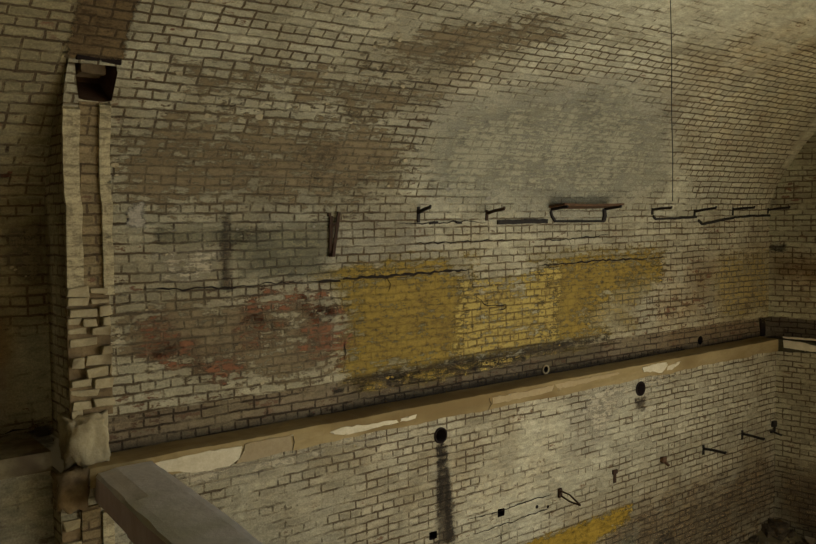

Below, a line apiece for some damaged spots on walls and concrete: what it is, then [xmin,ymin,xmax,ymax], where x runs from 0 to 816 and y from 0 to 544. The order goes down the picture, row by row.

crack [401,214,516,245]
crack [156,269,506,313]
peeling [782,336,816,352]
peeling [330,414,417,439]
peeling [155,434,293,473]
damp [437,444,453,544]